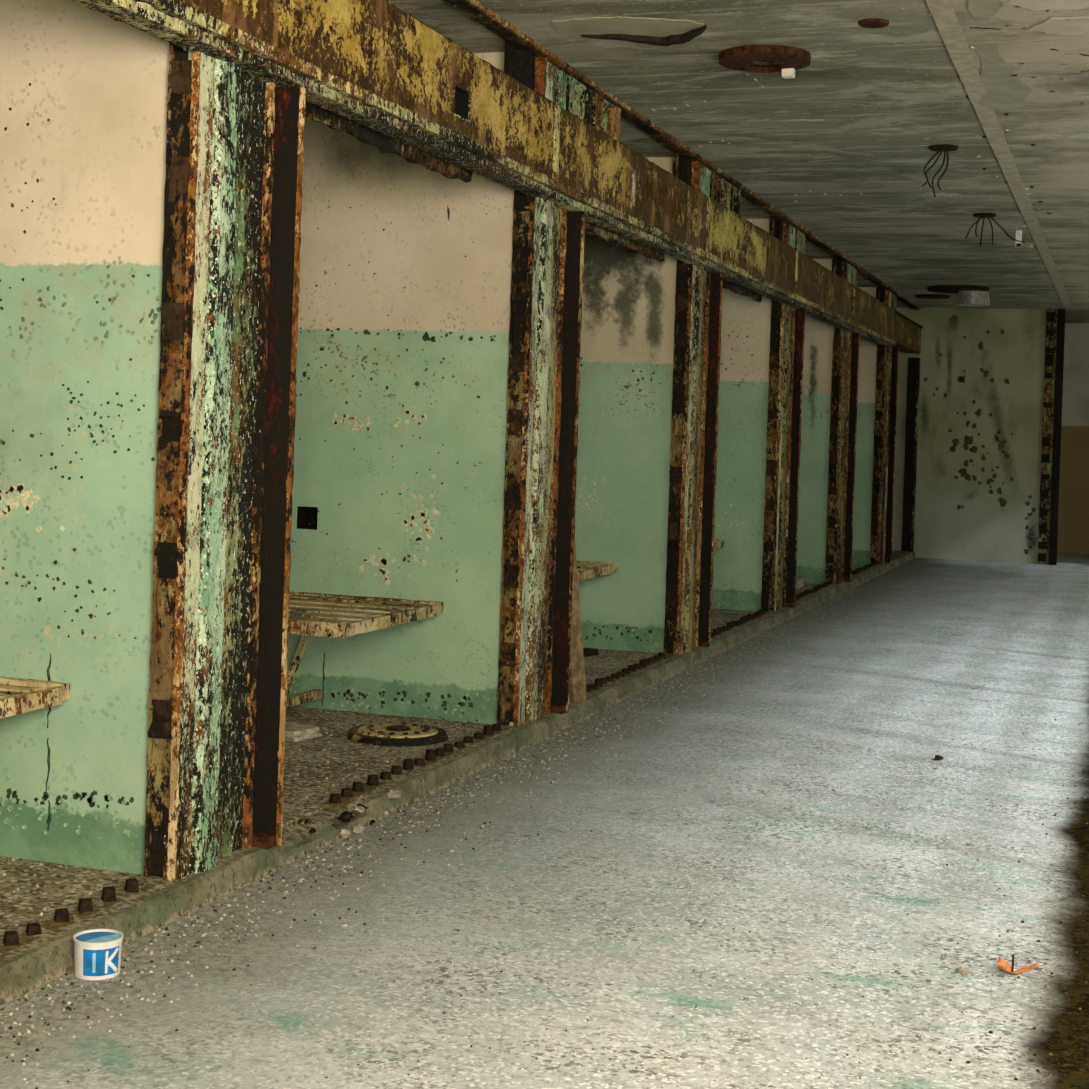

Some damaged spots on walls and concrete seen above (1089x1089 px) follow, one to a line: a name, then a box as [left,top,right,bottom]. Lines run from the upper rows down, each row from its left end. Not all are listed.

peeling [551,16,707,46]
damp [583,231,662,344]